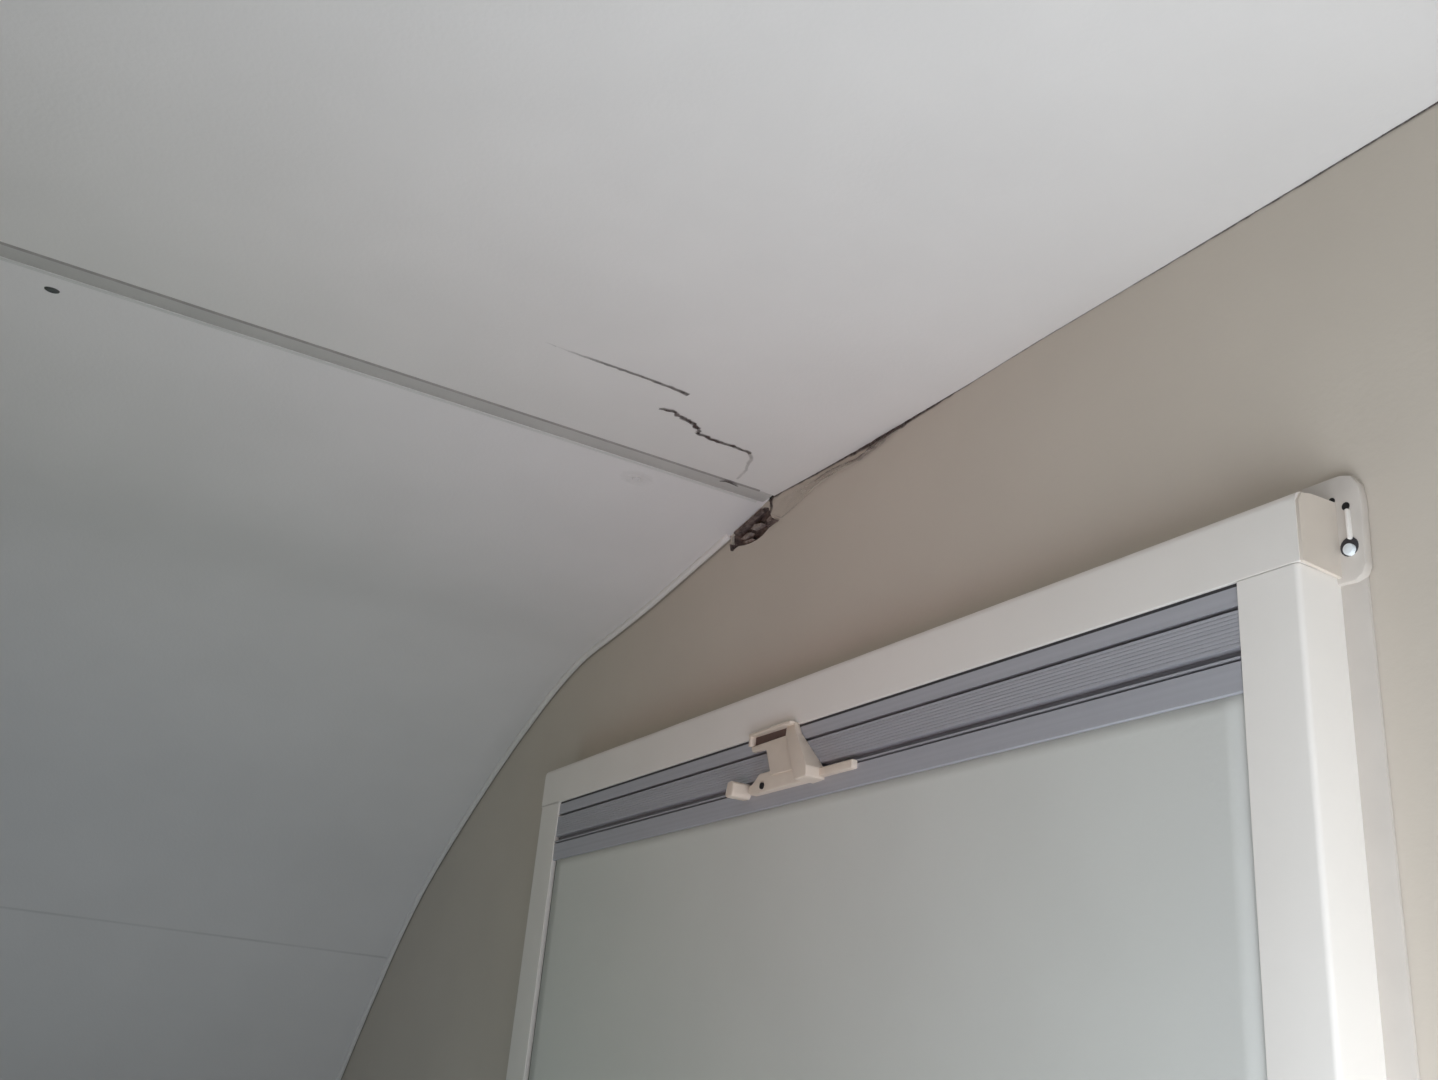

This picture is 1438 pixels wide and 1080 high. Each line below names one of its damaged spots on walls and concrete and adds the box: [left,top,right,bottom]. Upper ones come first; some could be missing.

crack [1135,102,1438,284]
crack [601,362,751,454]
crack [769,381,973,513]